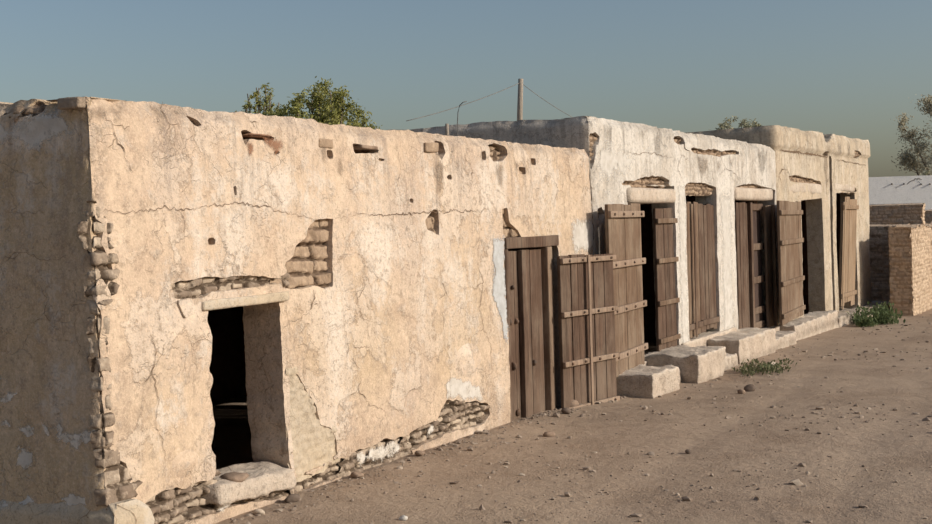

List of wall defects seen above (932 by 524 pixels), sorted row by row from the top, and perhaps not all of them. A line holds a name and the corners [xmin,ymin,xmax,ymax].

crack [105,202,309,232]
flaking render [270,219,332,289]
crack [344,142,501,236]
spalling [1,199,143,510]